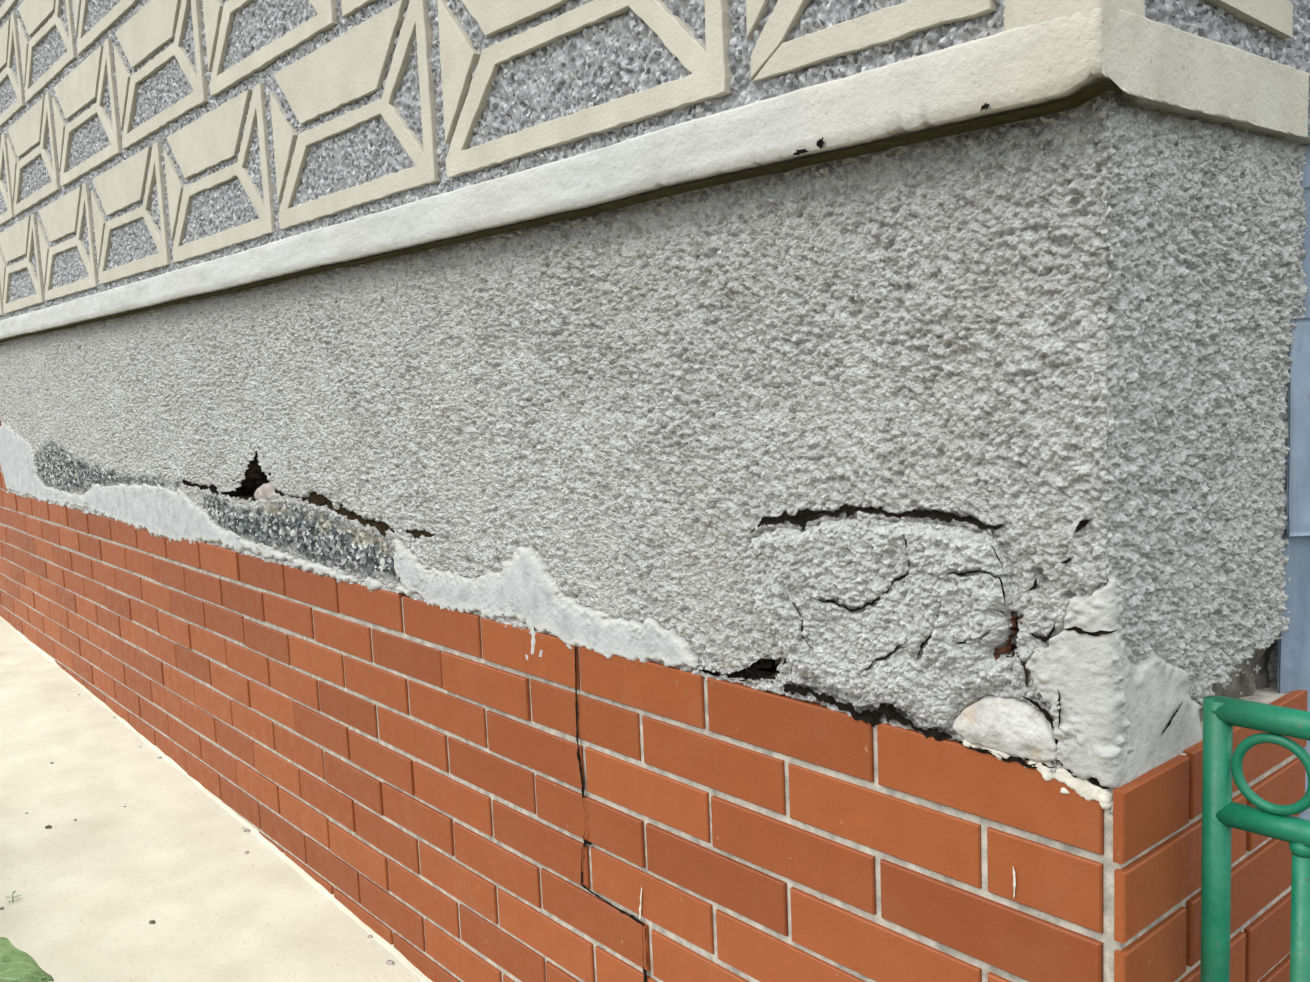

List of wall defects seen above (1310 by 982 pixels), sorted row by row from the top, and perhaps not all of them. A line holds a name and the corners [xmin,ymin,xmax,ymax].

peeling [34,442,178,492]
crack [183,480,218,494]
peeling [203,447,400,582]
crack [274,489,435,539]
crack [750,504,1118,789]
crack [575,645,647,982]